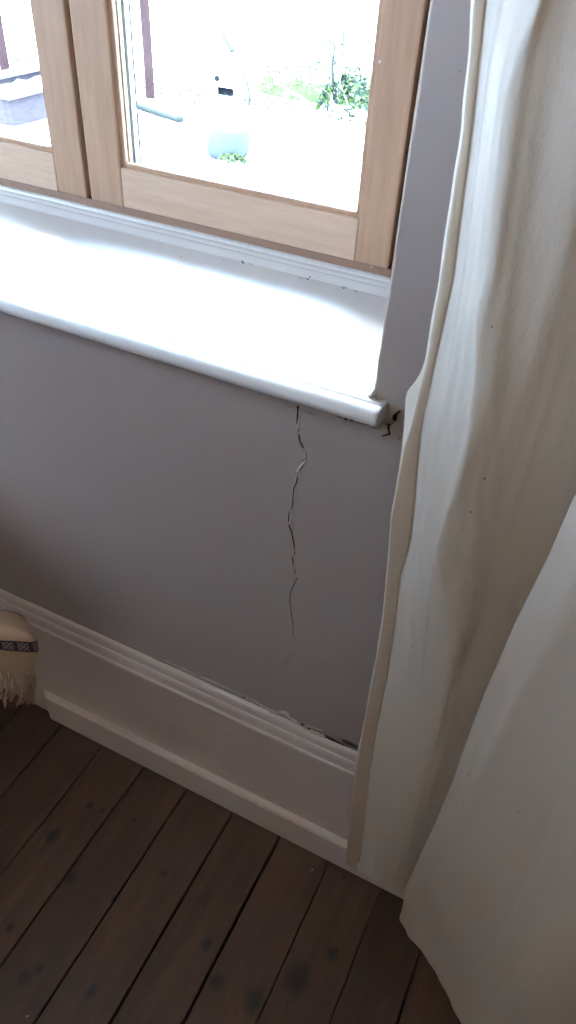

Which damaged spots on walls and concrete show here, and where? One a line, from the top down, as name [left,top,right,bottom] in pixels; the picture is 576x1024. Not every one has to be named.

crack [288,406,306,625]